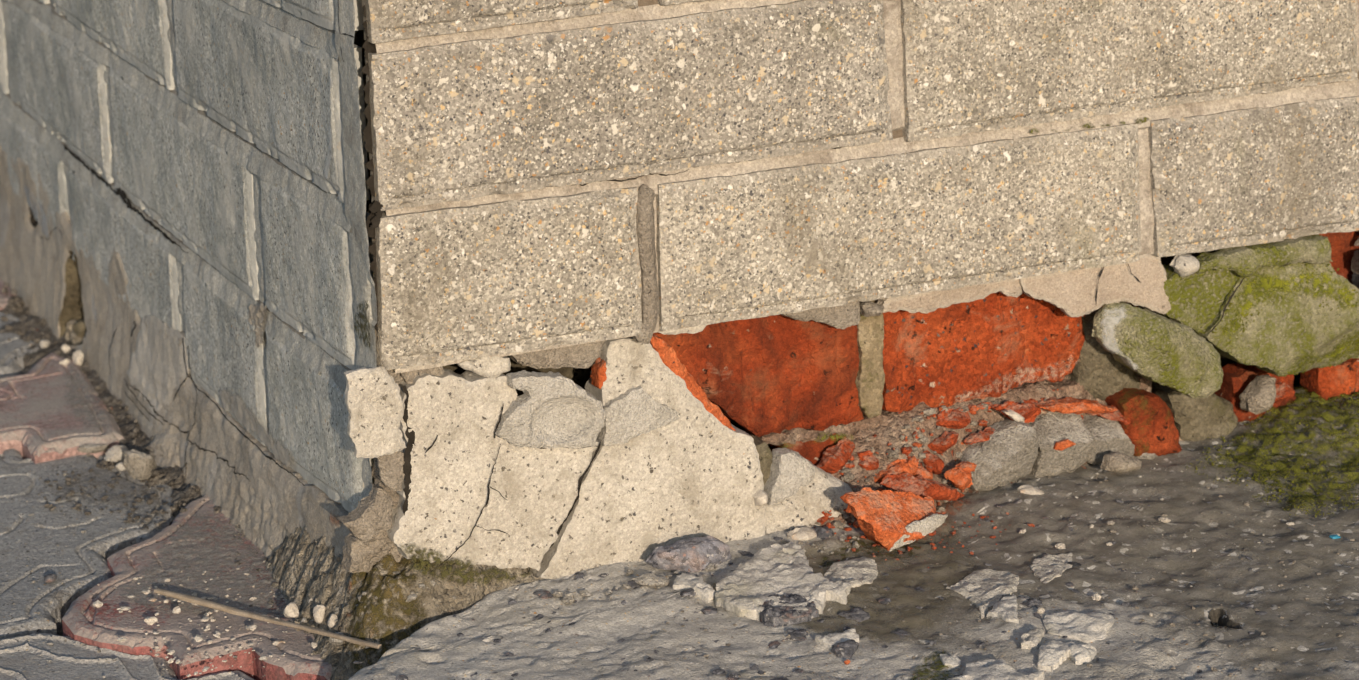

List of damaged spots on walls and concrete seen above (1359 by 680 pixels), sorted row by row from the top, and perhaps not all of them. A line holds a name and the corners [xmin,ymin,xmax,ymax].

crack [338,0,384,339]
flaking render [127,315,189,415]
flaking render [658,325,707,335]
flaking render [781,301,861,329]
flaking render [877,254,1171,317]
crack [402,385,438,516]
crack [435,404,509,569]
crack [539,440,602,557]
spalling [1053,439,1075,451]